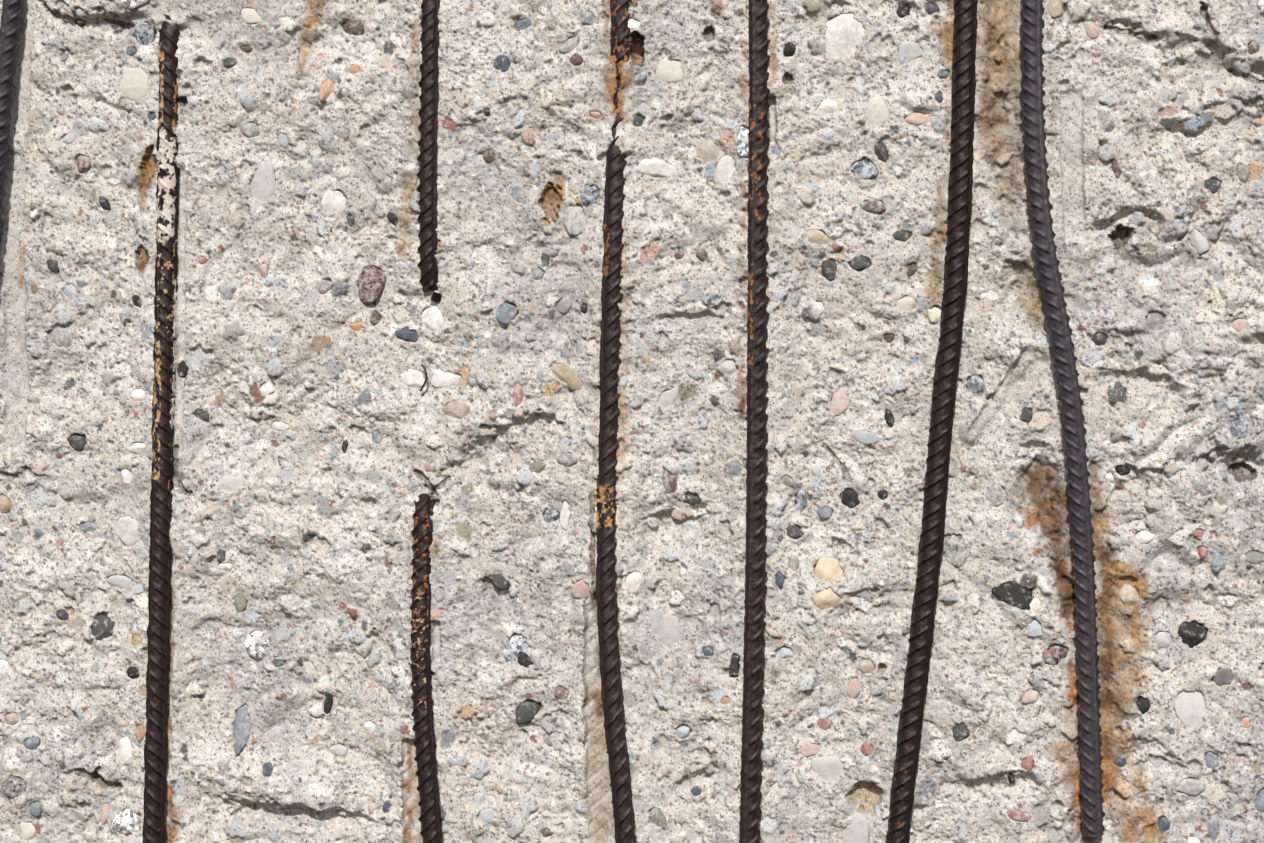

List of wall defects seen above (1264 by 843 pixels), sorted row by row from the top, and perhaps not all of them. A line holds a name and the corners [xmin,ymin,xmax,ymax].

rust [138,158,153,192]
spalling [416,0,540,306]
rust [938,23,953,56]
spalling [61,9,188,843]
spalling [381,493,443,843]
spalling [596,0,645,843]
spalling [644,0,793,843]
spalling [818,0,1189,843]
rust [1027,457,1076,629]
rust [1068,664,1079,705]
rust [1070,757,1095,843]
rust [1092,494,1148,796]